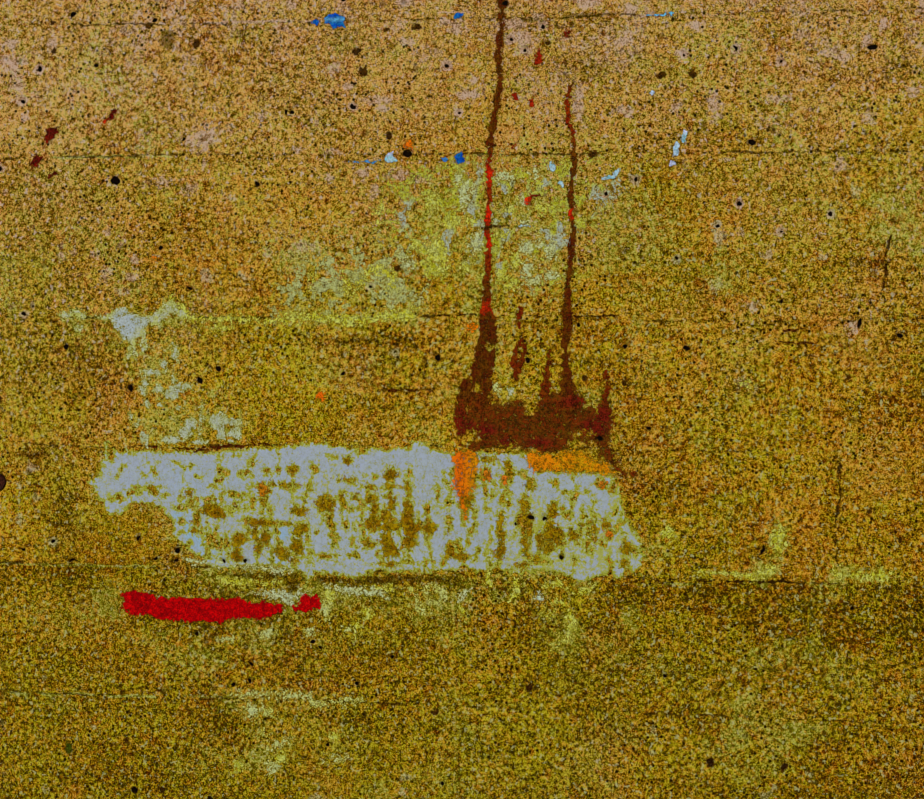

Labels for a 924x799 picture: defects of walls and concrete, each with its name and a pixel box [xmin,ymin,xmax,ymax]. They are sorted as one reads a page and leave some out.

peeling [86,438,646,591]